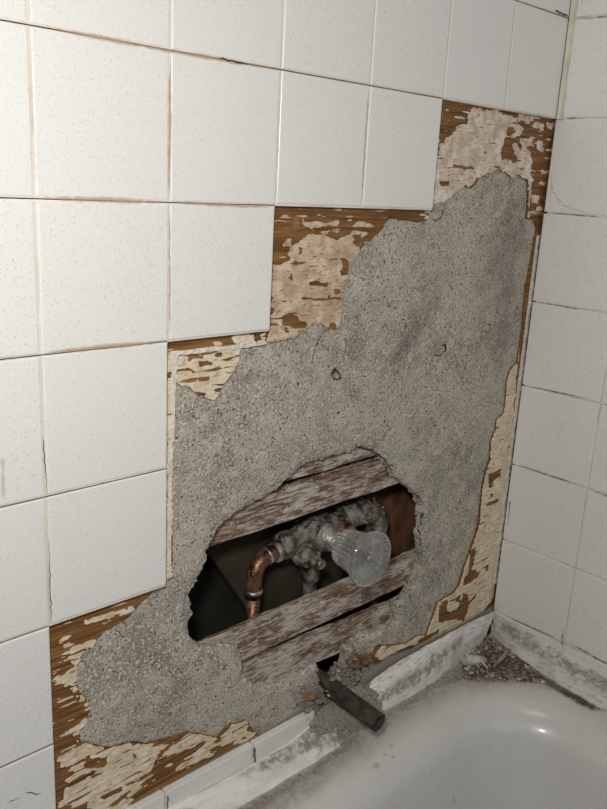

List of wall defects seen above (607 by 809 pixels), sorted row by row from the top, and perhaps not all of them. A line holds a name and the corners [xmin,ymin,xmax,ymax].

spalling [51,107,555,809]